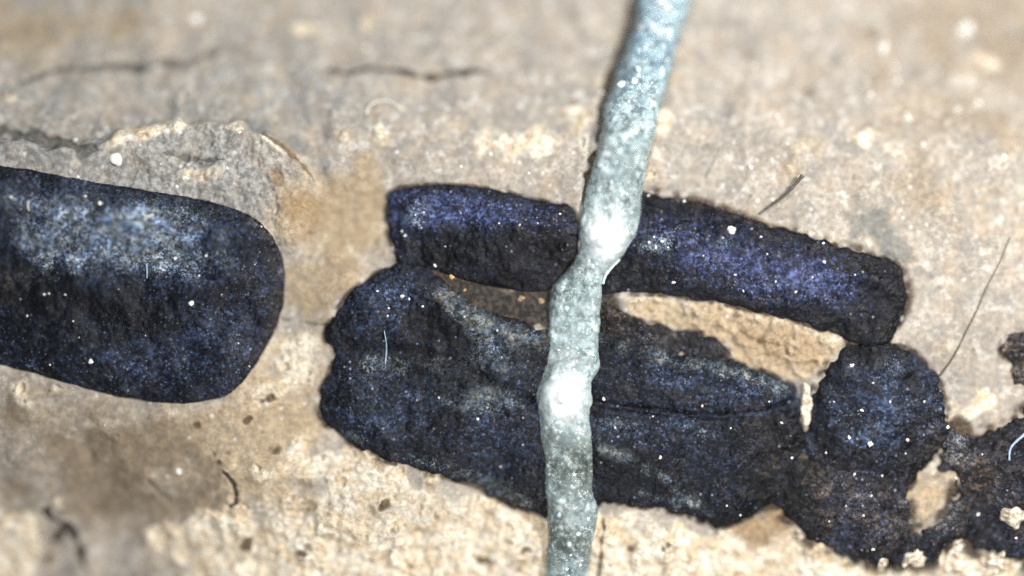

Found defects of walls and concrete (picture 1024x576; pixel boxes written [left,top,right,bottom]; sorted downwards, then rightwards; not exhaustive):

crack [582,0,634,205]
crack [596,518,605,576]